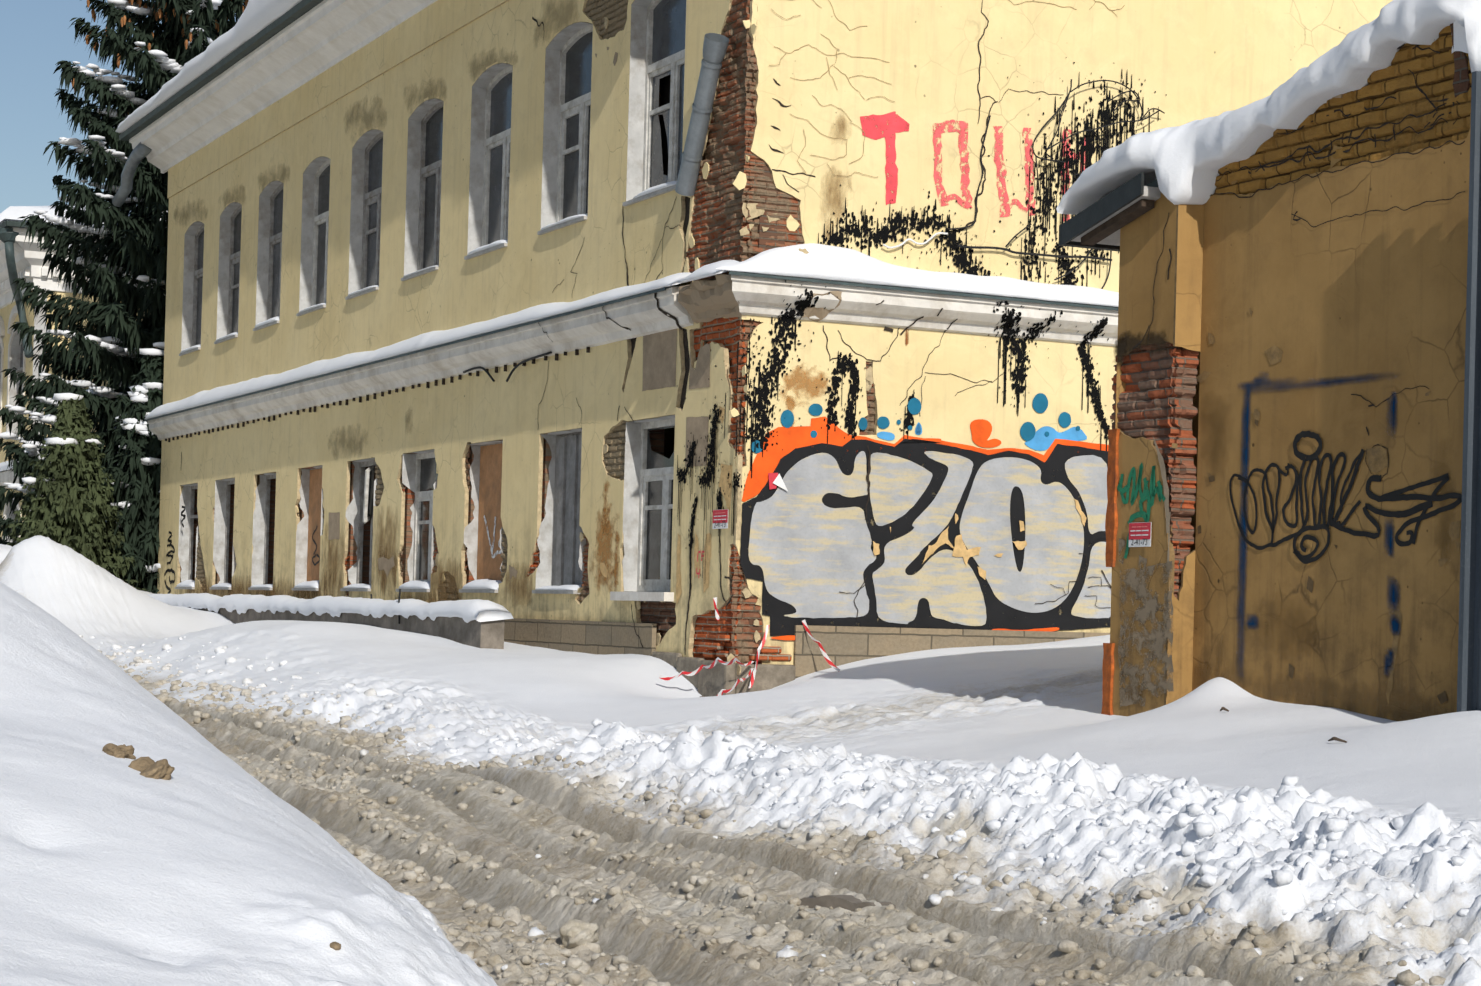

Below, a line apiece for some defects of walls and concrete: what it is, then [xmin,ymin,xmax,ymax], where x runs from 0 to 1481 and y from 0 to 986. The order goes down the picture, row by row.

flaking render [584,0,628,66]
flaking render [686,0,804,281]
crack [769,0,895,192]
crack [950,0,1125,233]
crack [1210,39,1465,227]
flaking render [1214,23,1472,195]
crack [823,300,1004,405]
leakage [596,484,619,585]
flaking render [603,420,629,480]
spalling [636,533,711,646]
spalling [693,544,792,675]
flaking render [1110,342,1215,707]